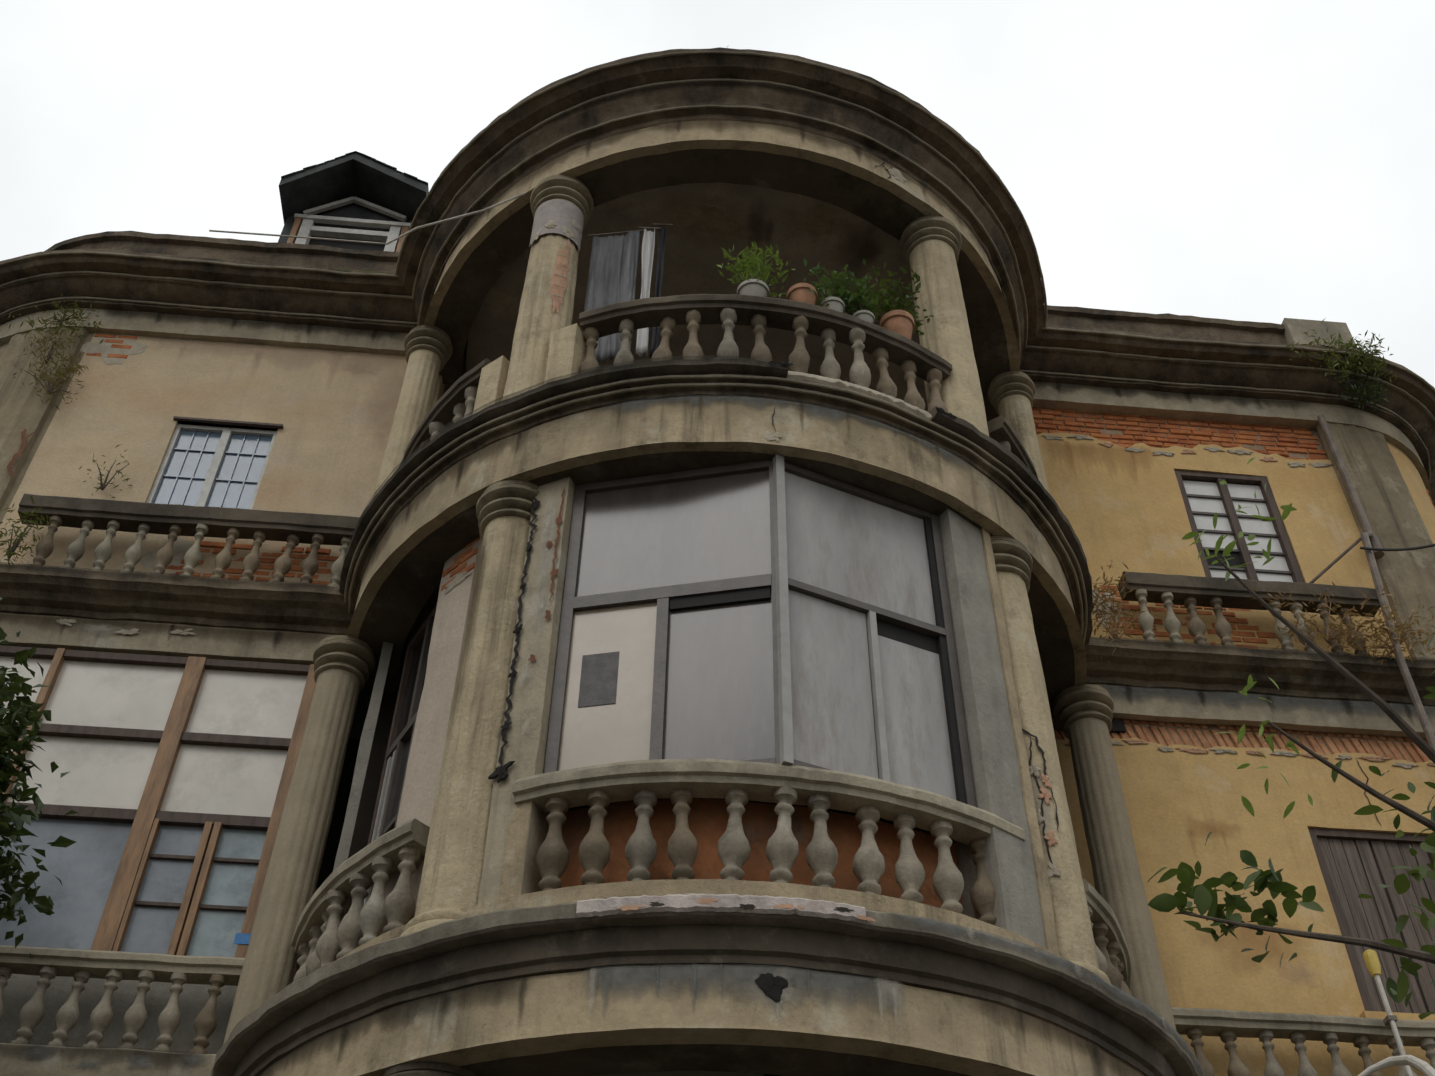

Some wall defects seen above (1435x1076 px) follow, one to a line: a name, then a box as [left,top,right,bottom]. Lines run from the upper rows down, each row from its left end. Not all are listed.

peeling [529,199,584,314]
flaking render [80,333,147,365]
flaking render [1032,408,1333,468]
flaking render [441,537,481,594]
flaking render [1109,718,1435,769]
crack [1356,759,1382,827]
spalling [576,894,876,924]
spalling [755,973,788,1005]